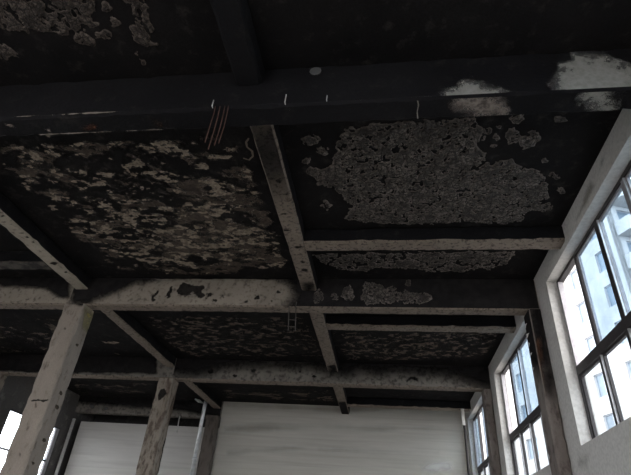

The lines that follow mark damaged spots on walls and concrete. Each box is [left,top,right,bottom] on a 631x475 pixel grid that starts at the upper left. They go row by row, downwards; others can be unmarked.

flaking render [0,0,121,47]
flaking render [123,0,158,65]
flaking render [301,81,566,225]
flaking render [0,132,287,275]
flaking render [312,250,515,273]
flaking render [313,280,432,306]
flaking render [150,316,323,357]
flaking render [334,332,496,361]